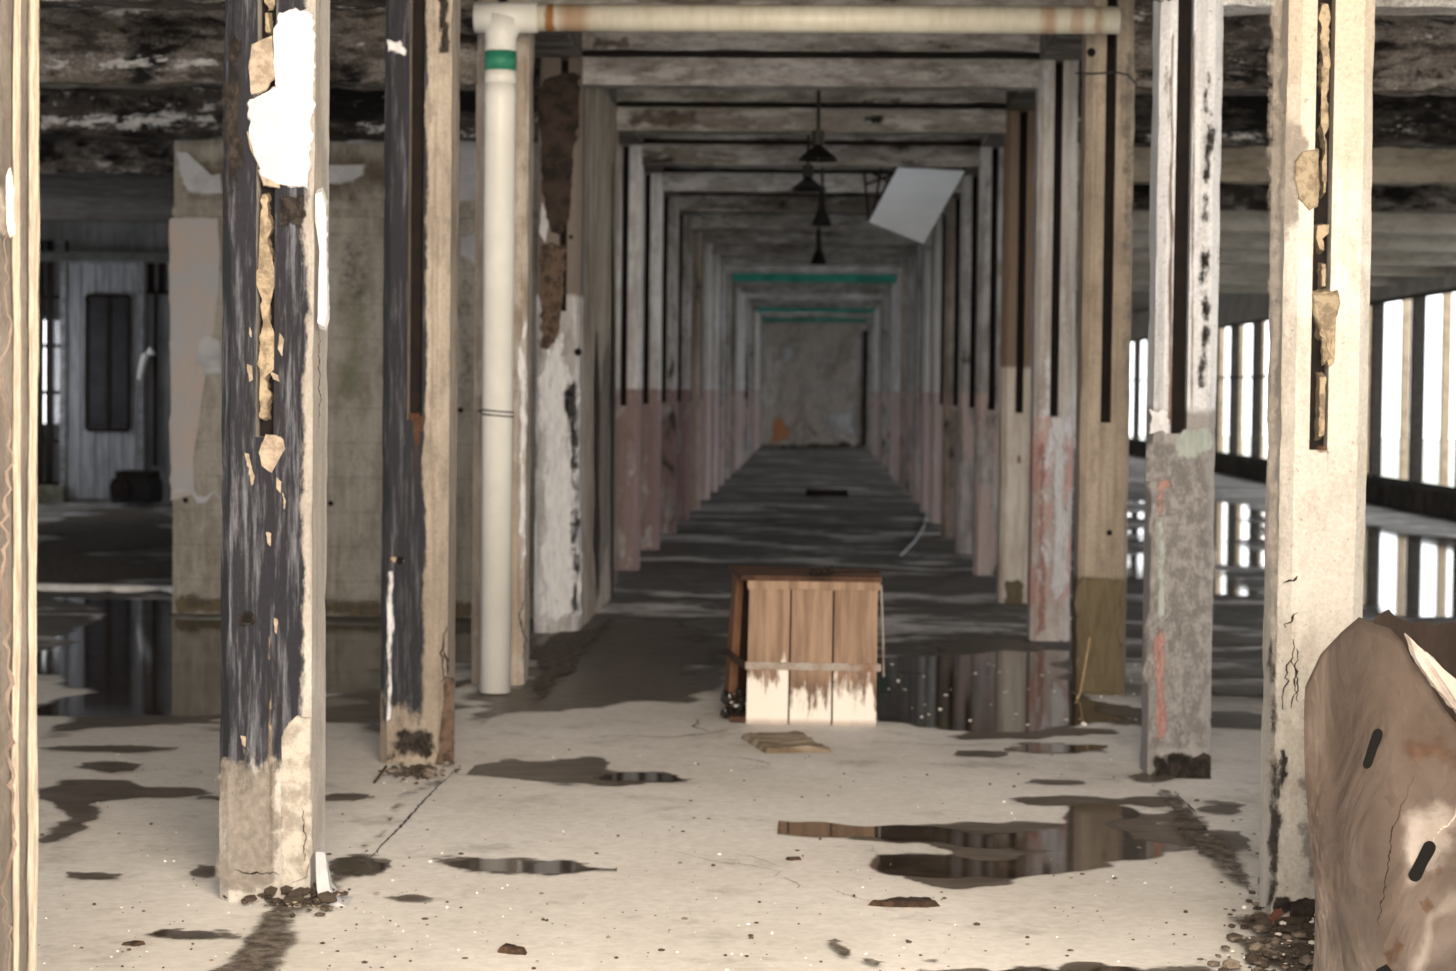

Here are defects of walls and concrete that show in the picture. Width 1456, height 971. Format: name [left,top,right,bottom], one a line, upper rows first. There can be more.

leakage [202,37,243,210]
flaking render [247,0,366,331]
leakage [329,155,385,201]
peeling [245,434,286,509]
crack [1281,576,1299,710]